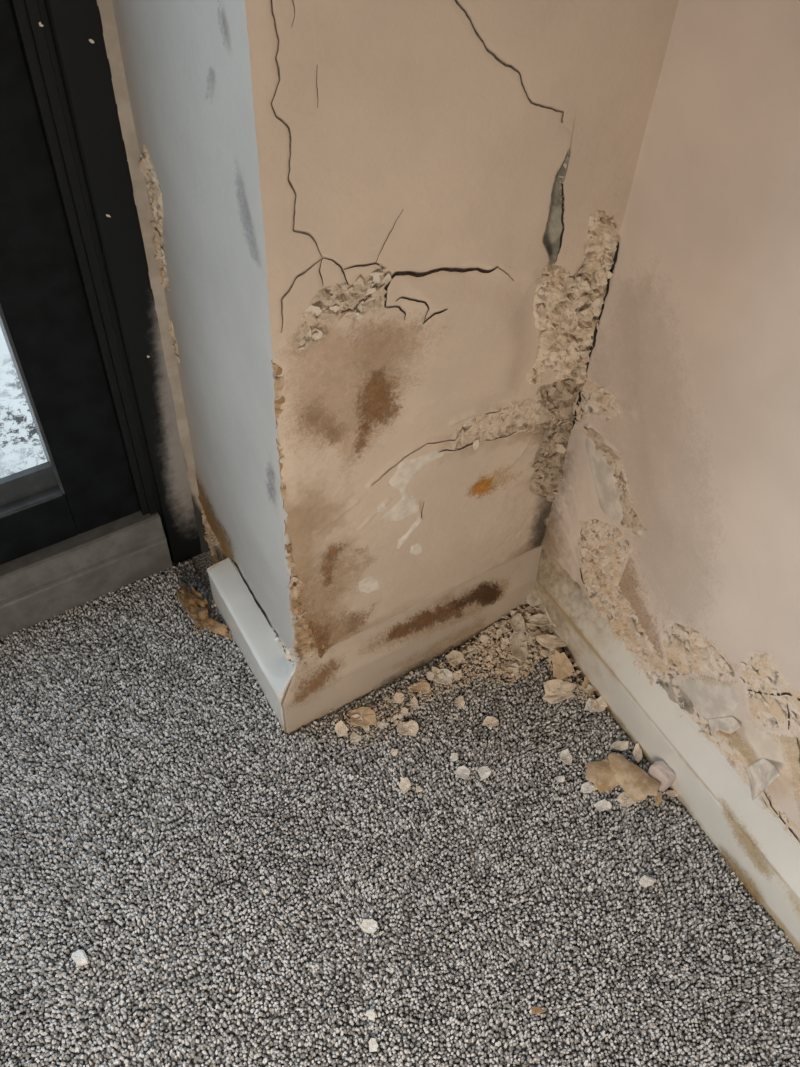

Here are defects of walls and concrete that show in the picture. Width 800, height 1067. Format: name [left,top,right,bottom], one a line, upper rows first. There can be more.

crack [455,0,564,123]
crack [271,0,514,333]
crack [556,178,564,260]
spalling [293,263,392,357]
rust [472,471,511,496]
spalling [377,149,800,845]
damp [292,587,364,658]
peeling [335,594,608,743]
crack [748,690,800,765]
crack [763,791,800,842]